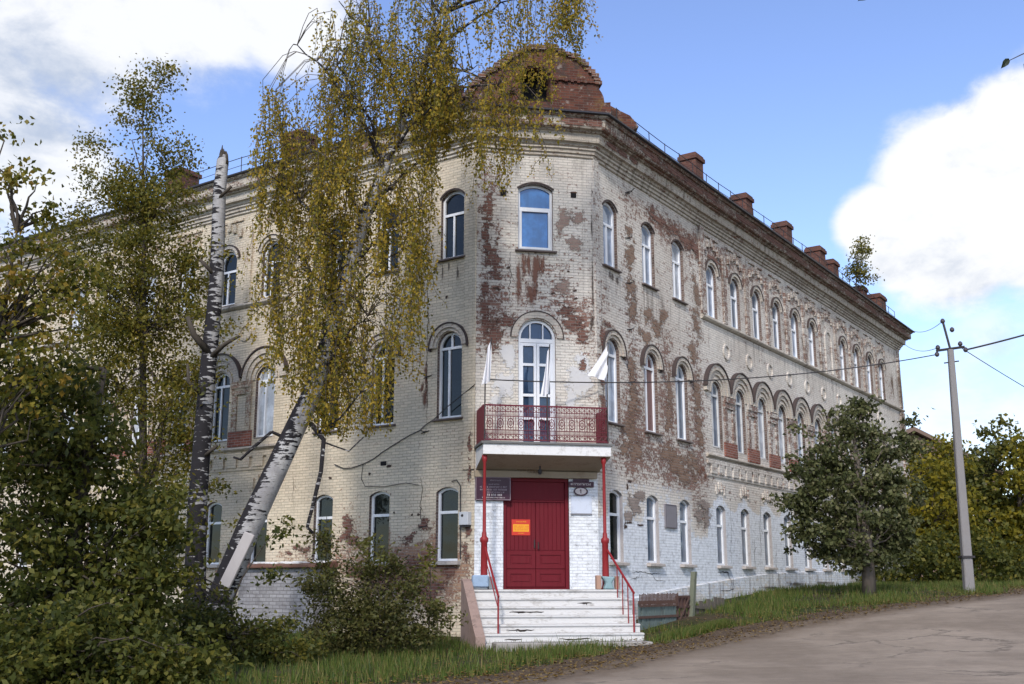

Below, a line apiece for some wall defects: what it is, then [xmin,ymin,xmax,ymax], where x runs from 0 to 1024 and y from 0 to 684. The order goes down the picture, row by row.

spalling [555,192,585,255]
spalling [478,190,516,407]
spalling [617,205,750,486]
spalling [339,513,472,607]
spalling [624,480,646,529]
spalling [692,497,713,529]